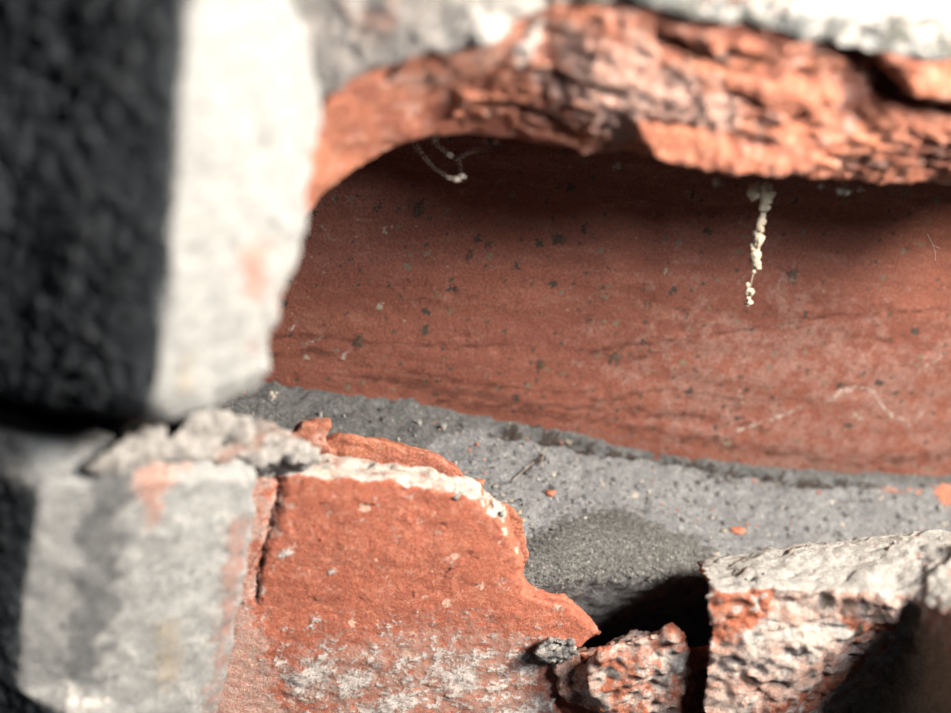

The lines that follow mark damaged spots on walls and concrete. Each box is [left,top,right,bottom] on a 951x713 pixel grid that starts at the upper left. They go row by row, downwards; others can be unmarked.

spalling [262,0,951,477]
crack [249,476,283,601]
efflorescence [259,608,558,713]
crack [688,669,708,713]